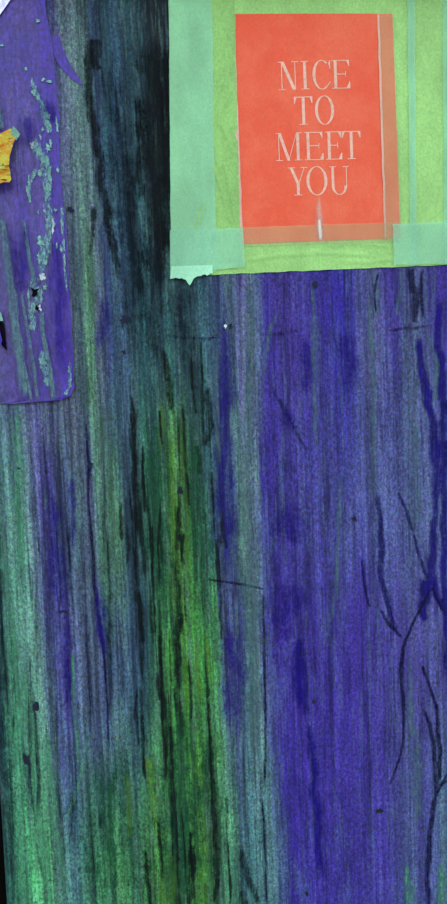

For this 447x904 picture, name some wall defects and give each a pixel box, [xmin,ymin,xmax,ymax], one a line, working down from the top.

peeling [24,67,74,330]
peeling [39,351,50,386]
crack [361,304,447,904]